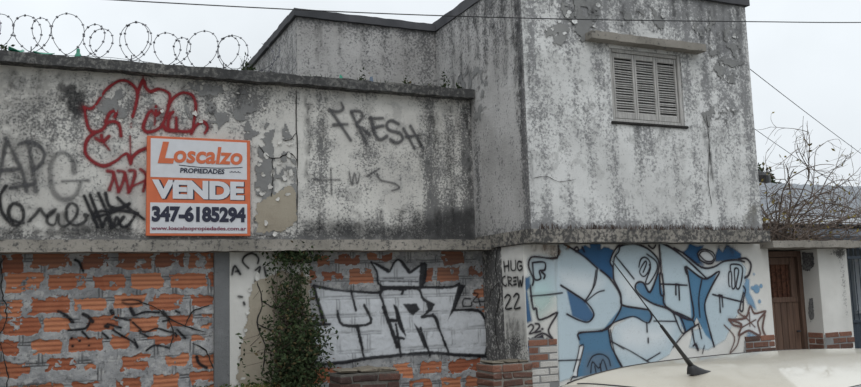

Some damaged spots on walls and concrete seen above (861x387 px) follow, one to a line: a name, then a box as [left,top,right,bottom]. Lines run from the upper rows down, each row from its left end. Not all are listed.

peeling [544,0,602,46]
leakage [62,84,84,115]
peeling [184,80,298,237]
spalling [528,337,560,387]